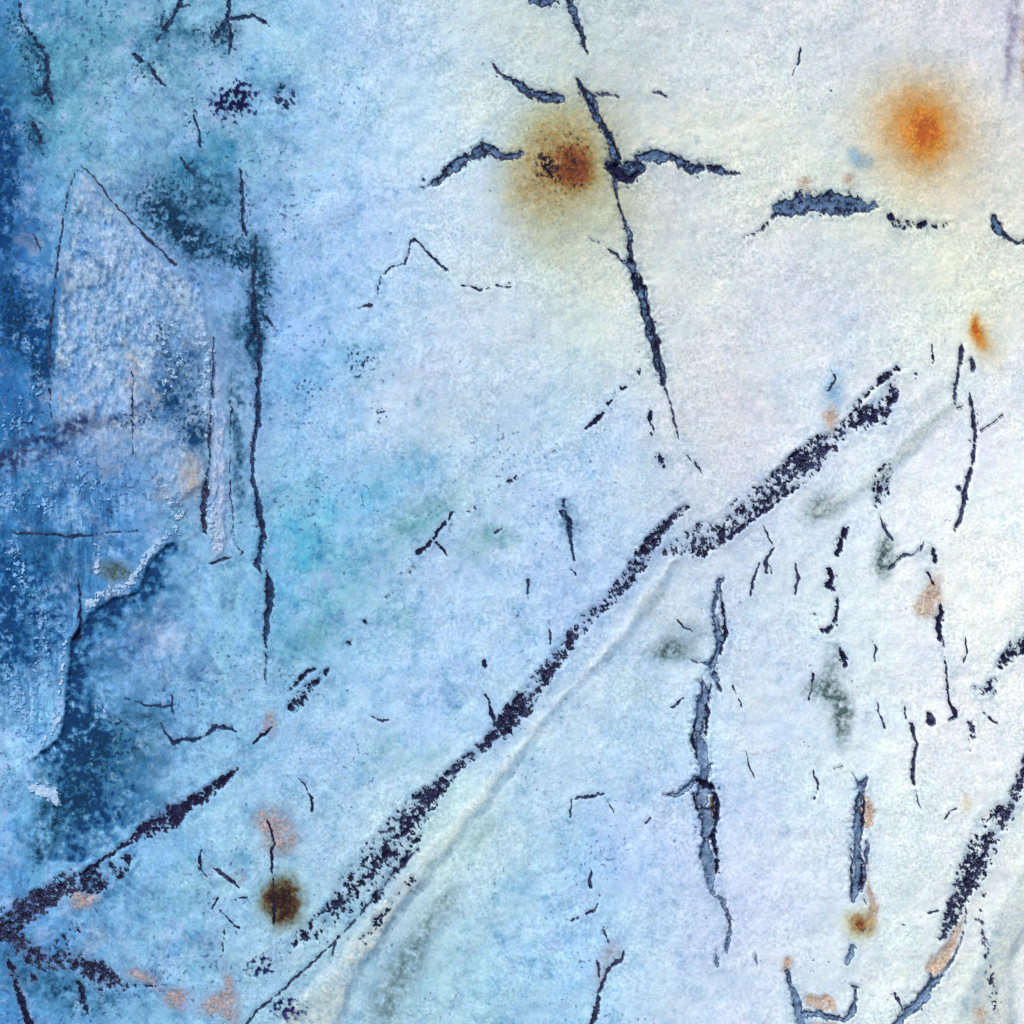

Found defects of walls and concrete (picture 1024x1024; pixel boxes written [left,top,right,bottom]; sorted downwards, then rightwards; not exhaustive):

rust [517,114,600,211]
rust [880,85,961,174]
crack [491,62,740,473]
rust [969,315,988,351]
crack [199,168,275,685]
crack [914,343,1003,531]
peeling [0,175,239,1024]
crack [749,525,850,667]
rust [259,876,302,927]
crack [663,577,742,967]
crack [813,765,869,903]
rust [849,913,870,934]